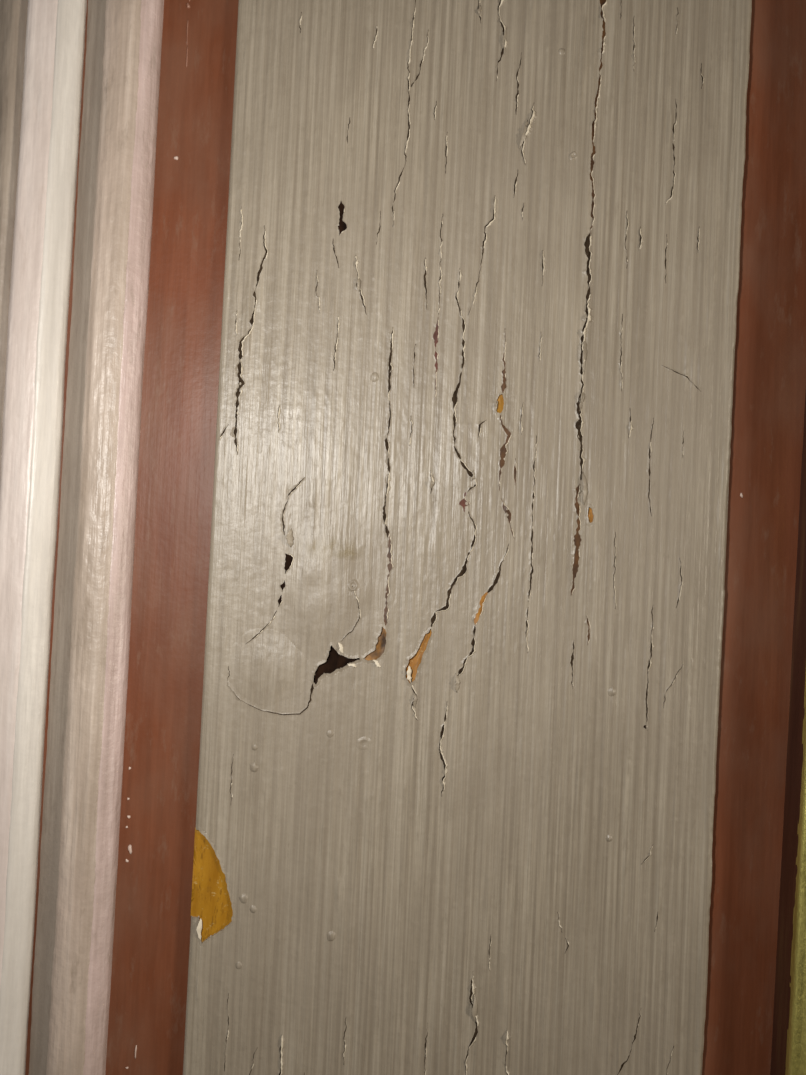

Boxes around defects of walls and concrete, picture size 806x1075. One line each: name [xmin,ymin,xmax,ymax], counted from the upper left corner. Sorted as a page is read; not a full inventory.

crack [314,0,449,371]
crack [664,63,705,205]
crack [218,207,269,455]
crack [340,0,538,797]
crack [569,0,636,689]
crack [618,314,655,516]
peeling [338,624,390,667]
peeling [402,626,435,688]
crack [643,558,684,731]
peeling [191,826,236,946]
crack [223,993,306,1075]
crack [463,934,511,1075]